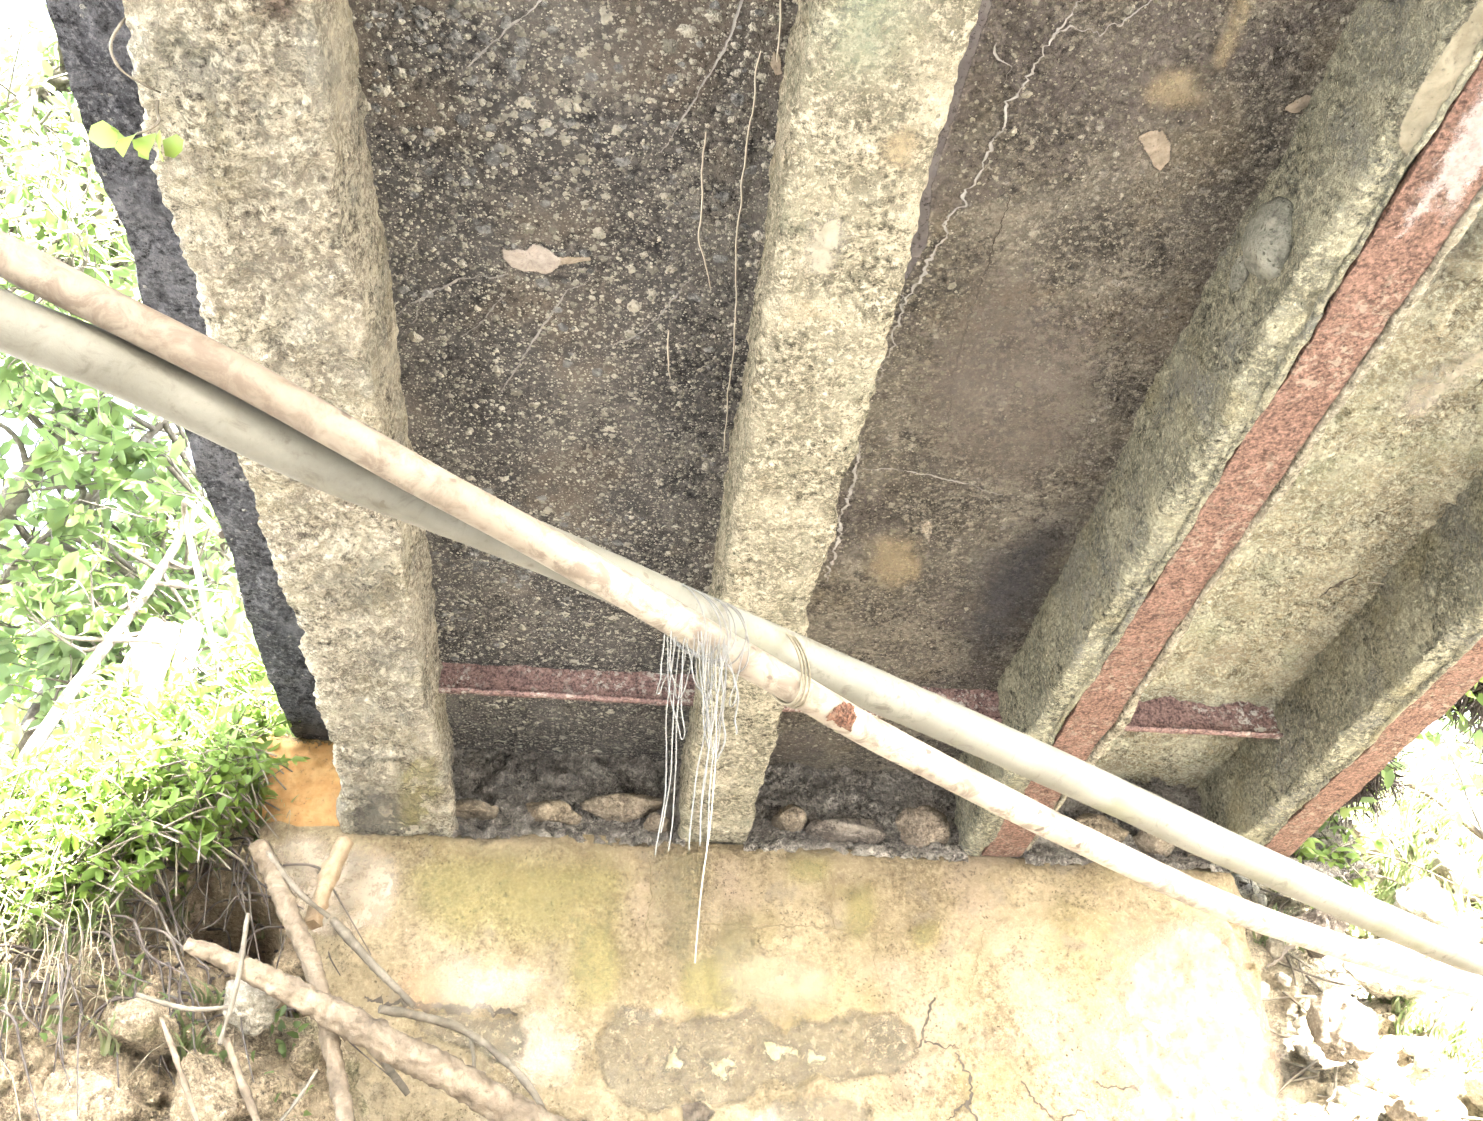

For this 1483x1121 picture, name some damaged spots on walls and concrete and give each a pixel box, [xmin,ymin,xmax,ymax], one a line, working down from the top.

crack [875,0,1151,381]
crack [947,195,1011,428]
crack [824,445,1003,582]
spalling [595,1007,919,1121]
crack [916,935,983,1121]
crack [1021,1081,1139,1121]